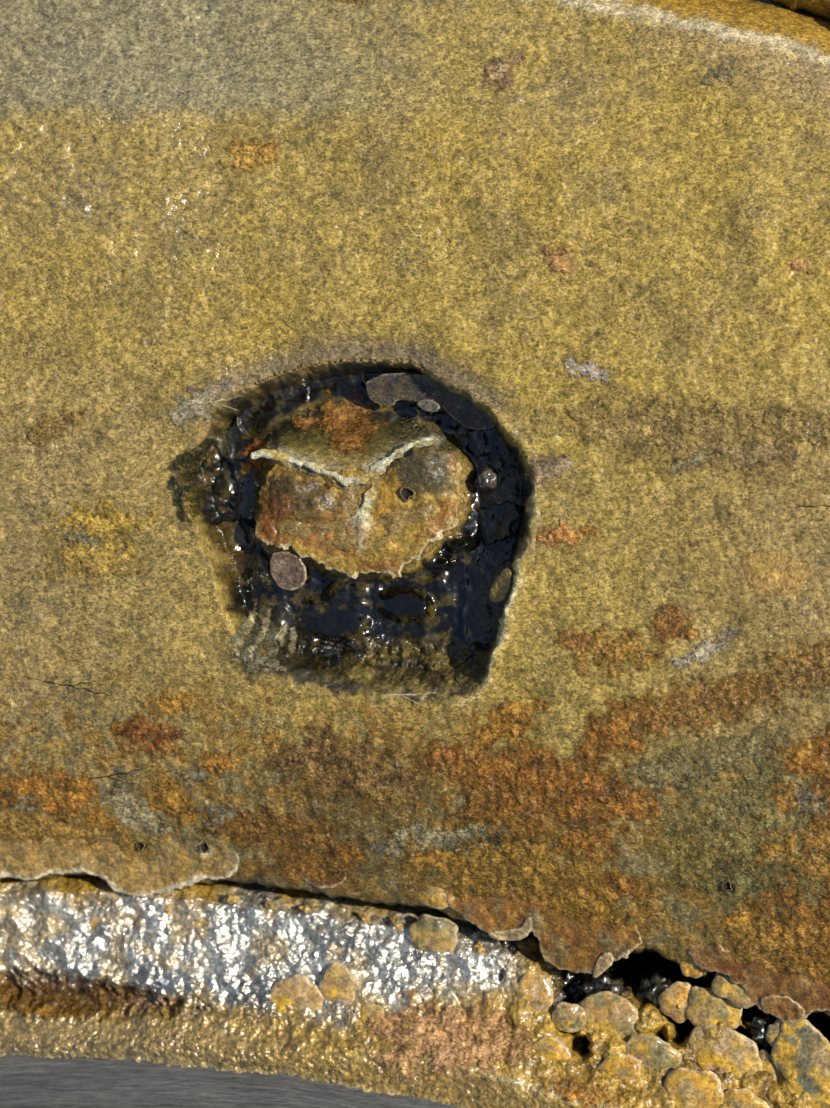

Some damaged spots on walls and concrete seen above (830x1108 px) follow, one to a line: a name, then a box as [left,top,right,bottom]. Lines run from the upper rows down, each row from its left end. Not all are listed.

water stain [168,375,236,428]
peeling [365,372,495,430]
peeling [184,419,212,452]
rust [240,439,268,474]
rust [292,387,388,486]
peeling [255,444,464,591]
rust [529,520,597,549]
peeling [489,568,512,602]
water stain [226,602,298,685]
rust [550,601,701,678]
rust [0,635,830,1108]